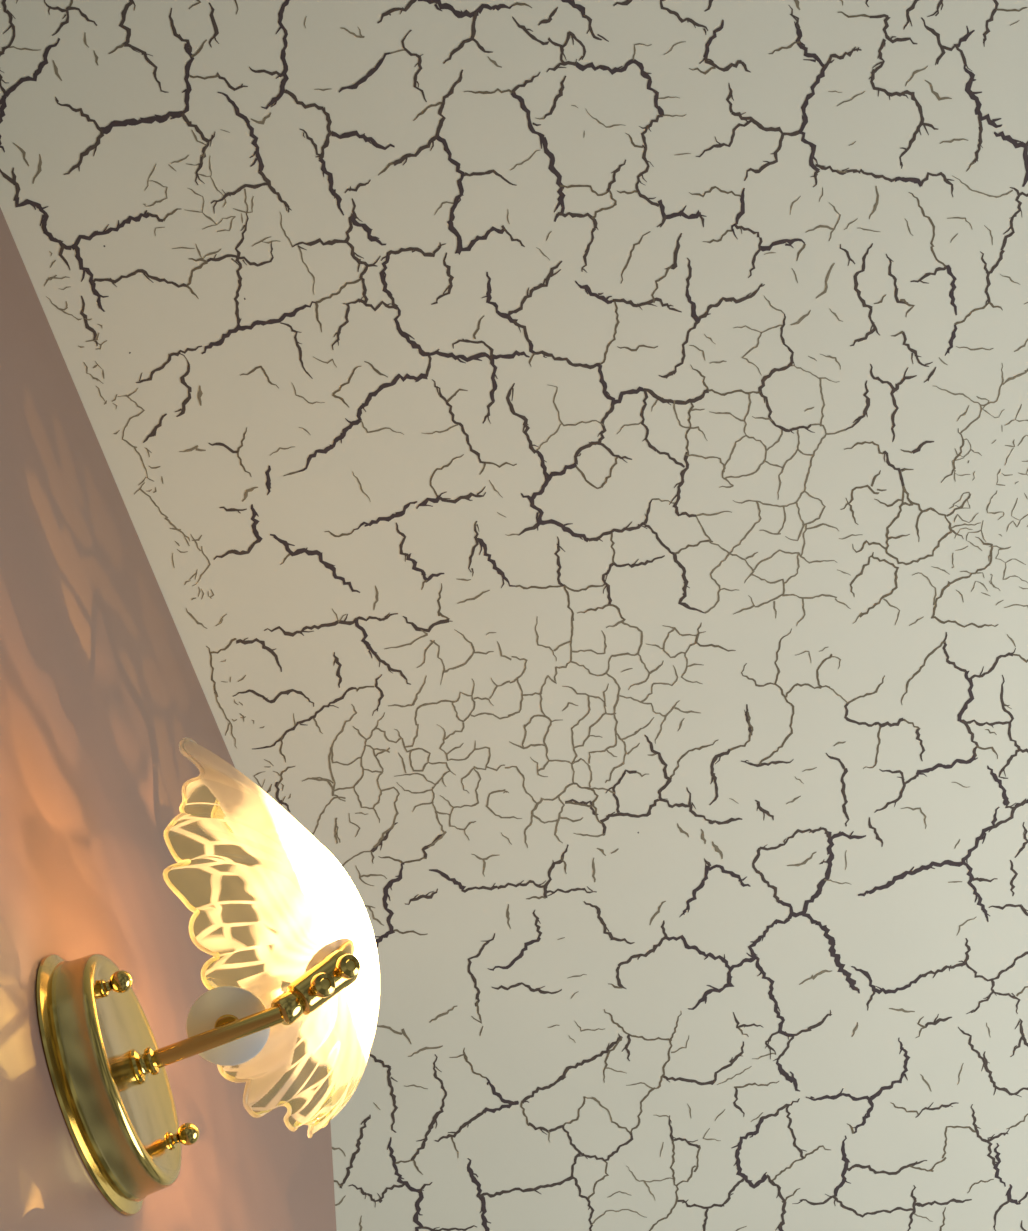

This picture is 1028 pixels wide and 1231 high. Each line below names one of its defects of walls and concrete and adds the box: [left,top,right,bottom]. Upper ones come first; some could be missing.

crack [0,0,1028,947]
crack [332,753,1028,1231]